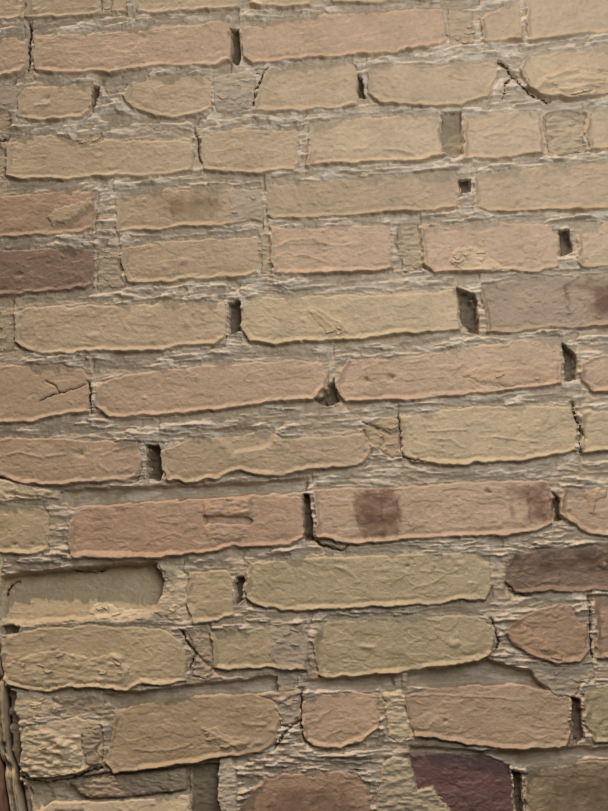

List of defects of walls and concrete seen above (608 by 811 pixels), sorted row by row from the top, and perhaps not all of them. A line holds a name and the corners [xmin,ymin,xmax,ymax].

crack [497,62,547,104]
crack [41,382,92,413]
crack [180,629,197,669]